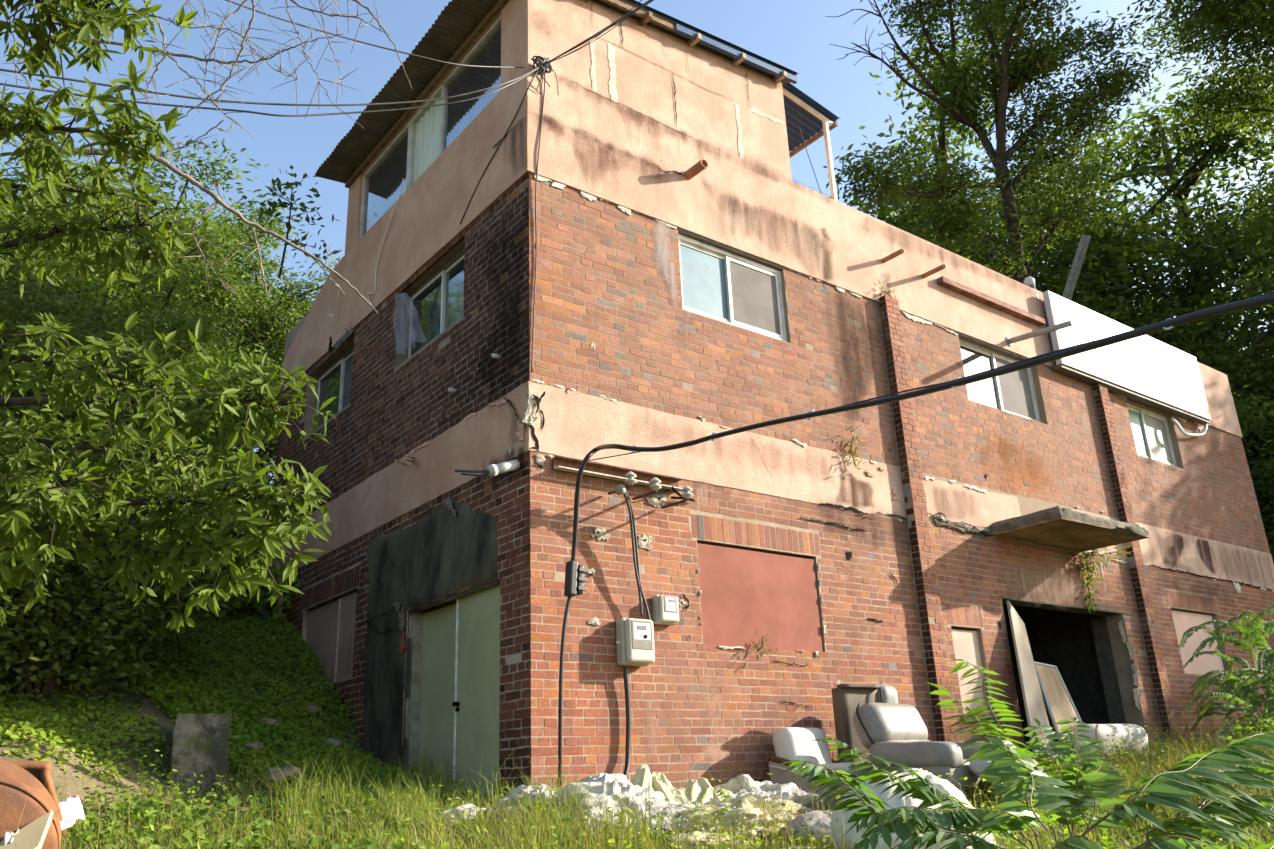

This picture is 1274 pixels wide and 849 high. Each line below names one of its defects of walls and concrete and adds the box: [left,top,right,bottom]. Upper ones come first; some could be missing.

crack [553,7,750,139]
peeling [534,173,566,190]
peeling [580,191,639,216]
spalling [522,380,576,425]
damp [1165,536,1215,572]